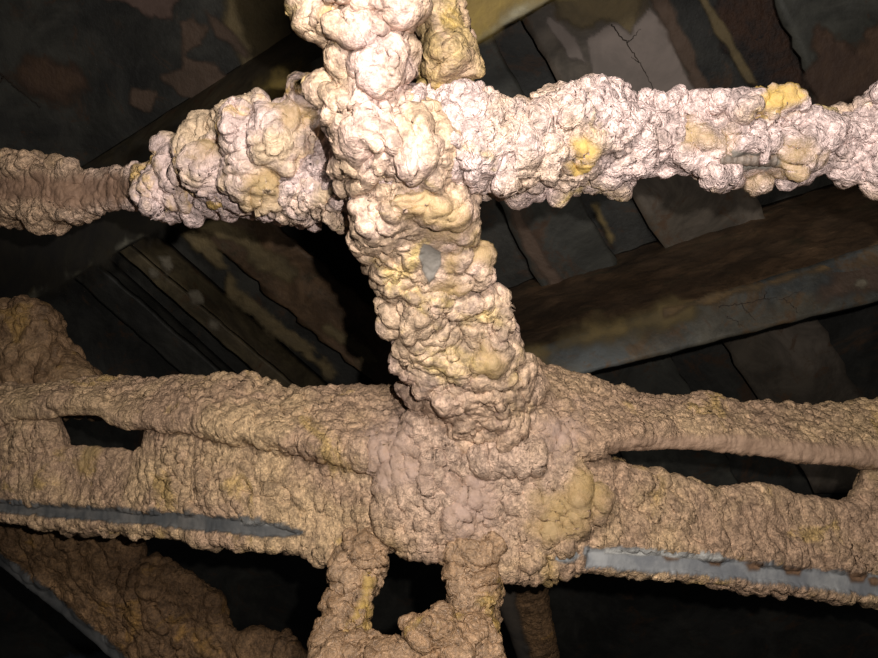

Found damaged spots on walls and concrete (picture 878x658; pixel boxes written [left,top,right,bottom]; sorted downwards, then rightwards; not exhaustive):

peeling [605,548,726,561]